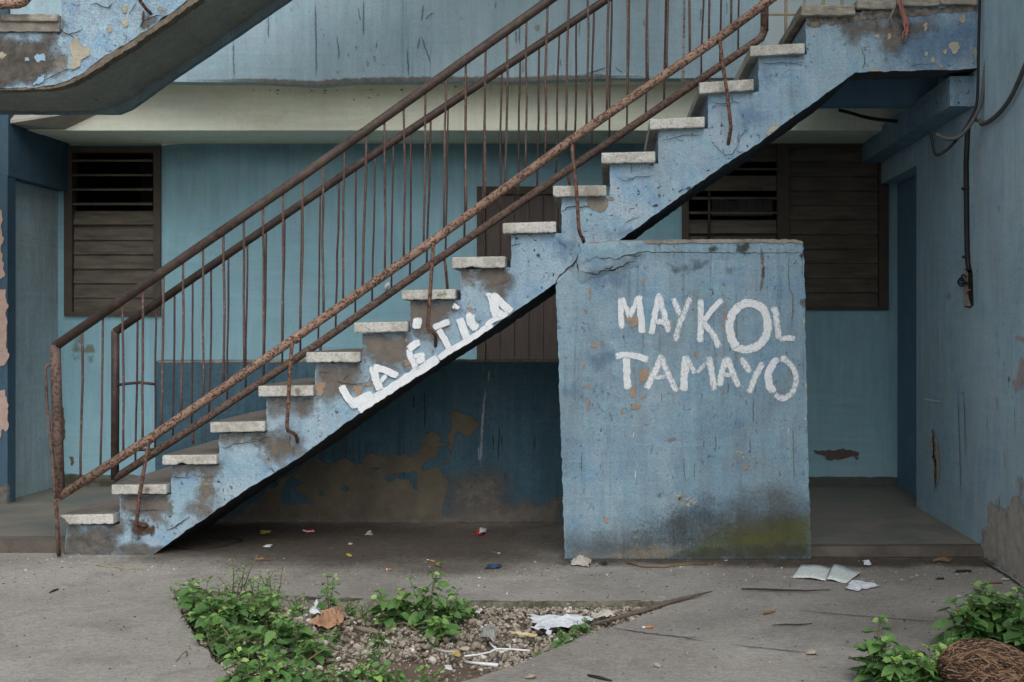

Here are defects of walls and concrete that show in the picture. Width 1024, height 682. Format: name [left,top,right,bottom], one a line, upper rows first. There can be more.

flaking render [108,5,165,32]
flaking render [25,36,90,85]
peeling [924,41,960,68]
crack [555,197,800,281]
flaking render [0,209,9,366]
flaking render [0,390,9,437]
flaking render [241,392,480,523]
flaking render [813,448,859,461]
water stain [575,494,809,559]
flaking render [981,478,1024,583]